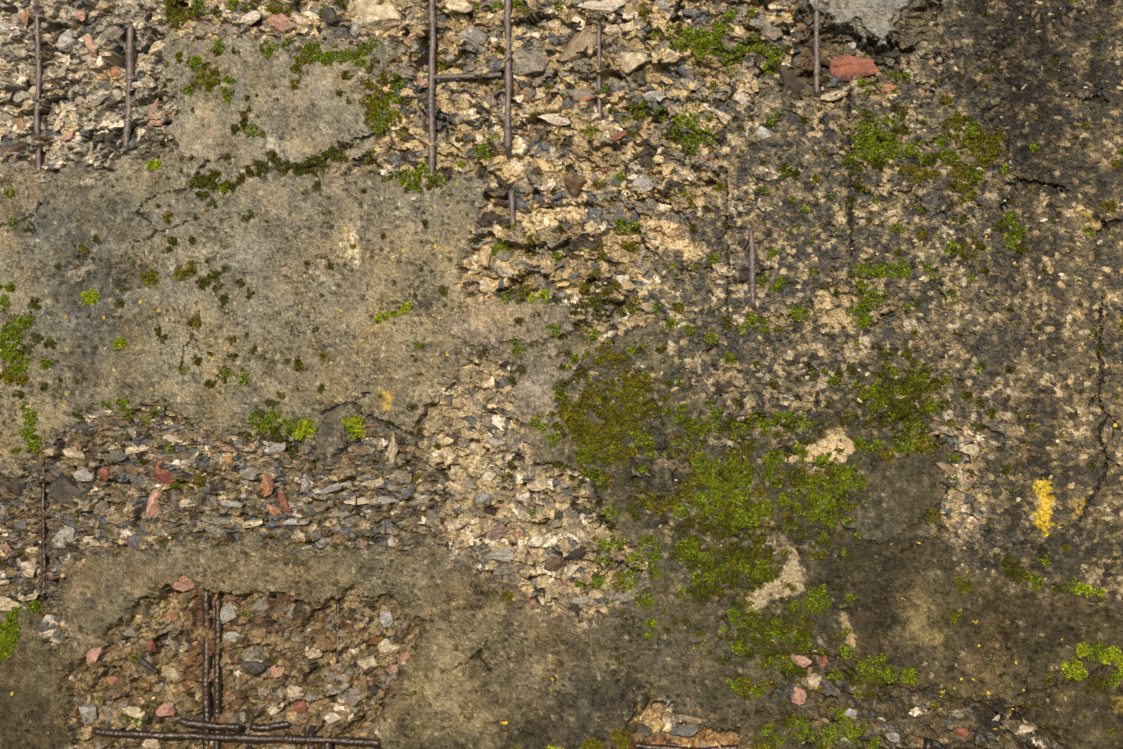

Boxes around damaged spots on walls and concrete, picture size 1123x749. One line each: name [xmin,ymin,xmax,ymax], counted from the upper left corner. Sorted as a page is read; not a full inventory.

rust [19,8,64,195]
spalling [0,0,944,347]
rust [173,582,350,749]
spalling [0,299,655,749]
spalling [626,682,742,749]
peeling [741,551,809,619]
peeling [878,586,948,659]
spalling [769,603,1067,749]